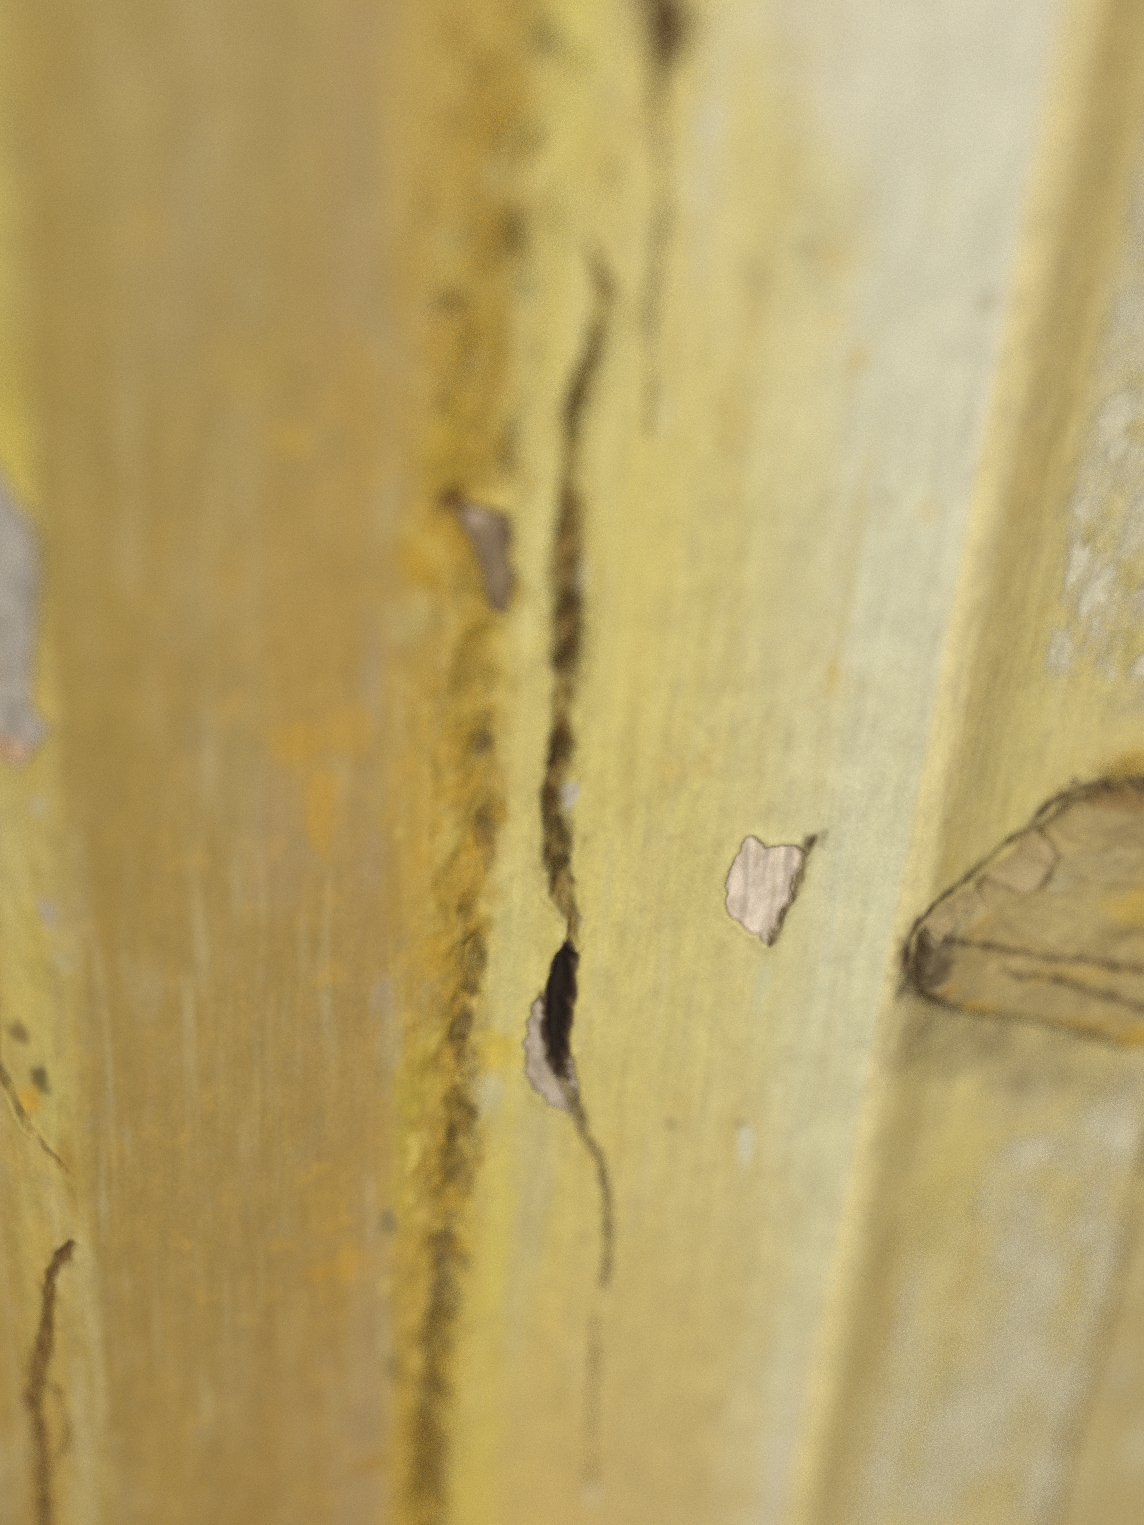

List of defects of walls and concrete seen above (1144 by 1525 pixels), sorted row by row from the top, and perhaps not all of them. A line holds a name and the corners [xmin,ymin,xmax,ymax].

crack [646,0,687,438]
peeling [0,386,47,769]
crack [540,243,612,1484]
peeling [725,835,818,947]
crack [24,1239,74,1525]